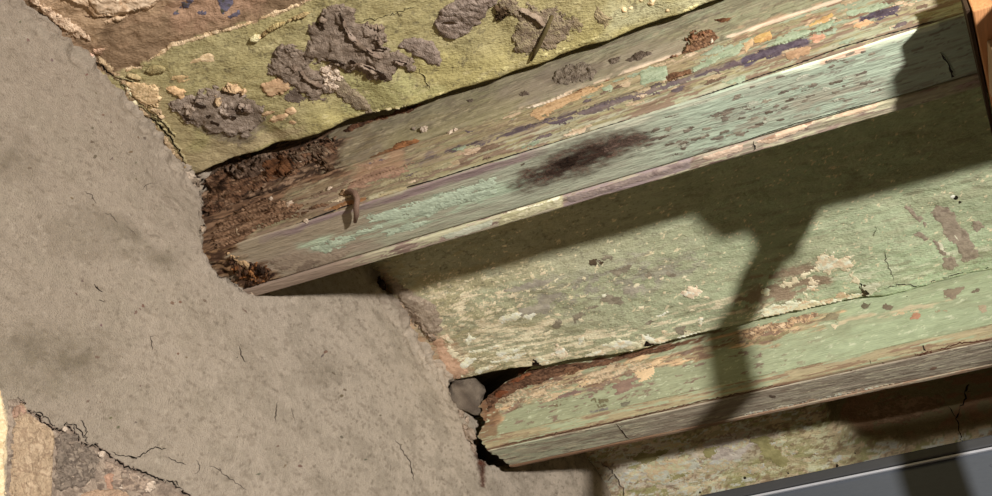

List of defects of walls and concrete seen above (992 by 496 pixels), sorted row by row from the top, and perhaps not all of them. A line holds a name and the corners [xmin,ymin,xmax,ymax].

flaking render [30,0,311,189]
peeling [442,0,936,239]
peeling [298,130,500,211]
water stain [508,133,650,188]
peeling [269,177,498,276]
peeling [904,201,985,270]
peeling [741,249,882,344]
peeling [883,303,921,320]
peeling [943,287,980,299]
peeling [745,383,894,415]
crack [17,397,246,496]